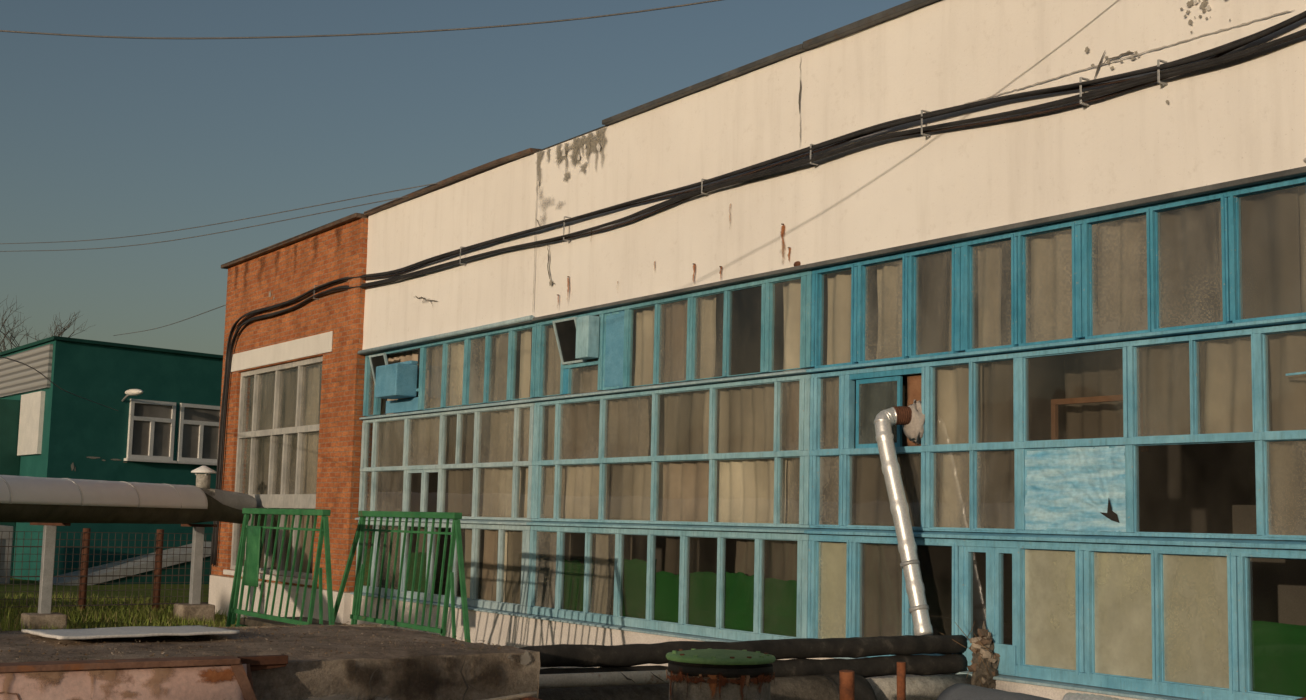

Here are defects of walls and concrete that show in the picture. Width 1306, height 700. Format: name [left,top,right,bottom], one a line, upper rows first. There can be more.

peeling [1180,0,1211,33]
peeling [537,127,606,222]